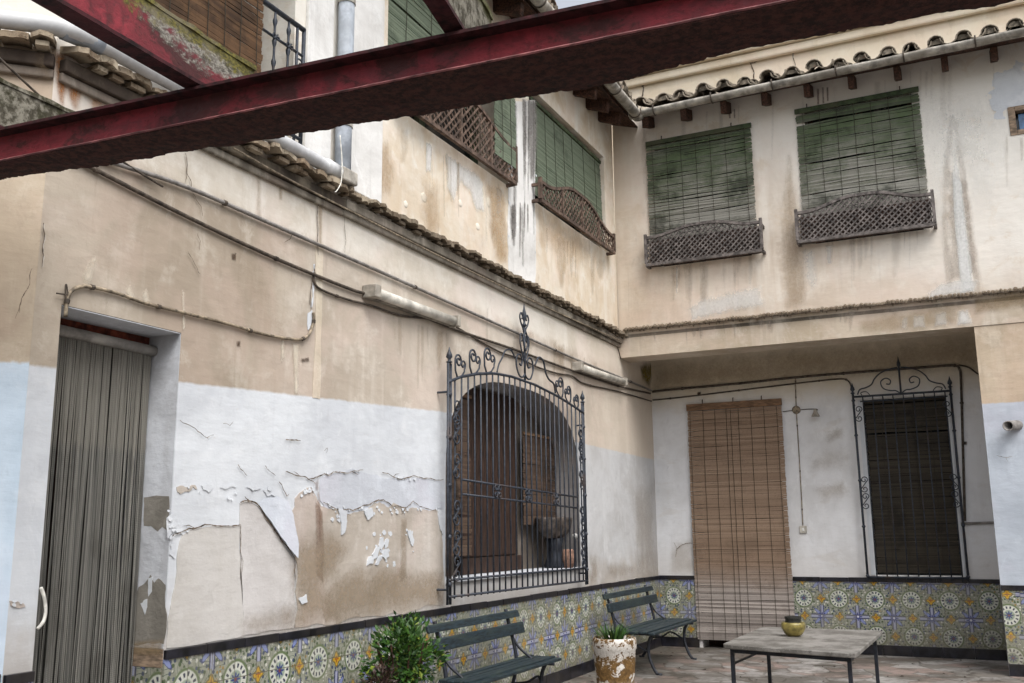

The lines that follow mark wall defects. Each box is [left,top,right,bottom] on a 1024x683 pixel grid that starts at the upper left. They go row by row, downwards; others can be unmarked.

rust [56,55,80,100]
leakage [509,100,537,178]
crack [15,223,45,318]
leakage [931,162,974,296]
flaking render [132,468,445,648]